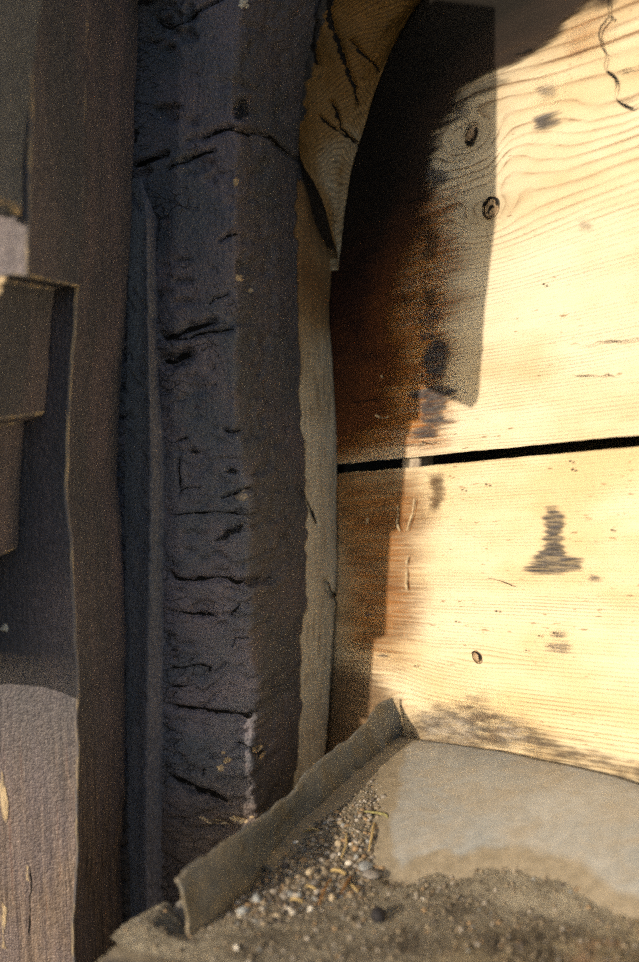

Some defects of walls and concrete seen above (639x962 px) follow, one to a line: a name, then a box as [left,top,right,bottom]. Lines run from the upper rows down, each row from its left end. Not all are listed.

crack [310,0,379,142]
crack [598,0,638,109]
leakage [409,336,457,438]
leakage [336,472,442,657]
leakage [525,506,581,574]
crack [25,874,33,936]